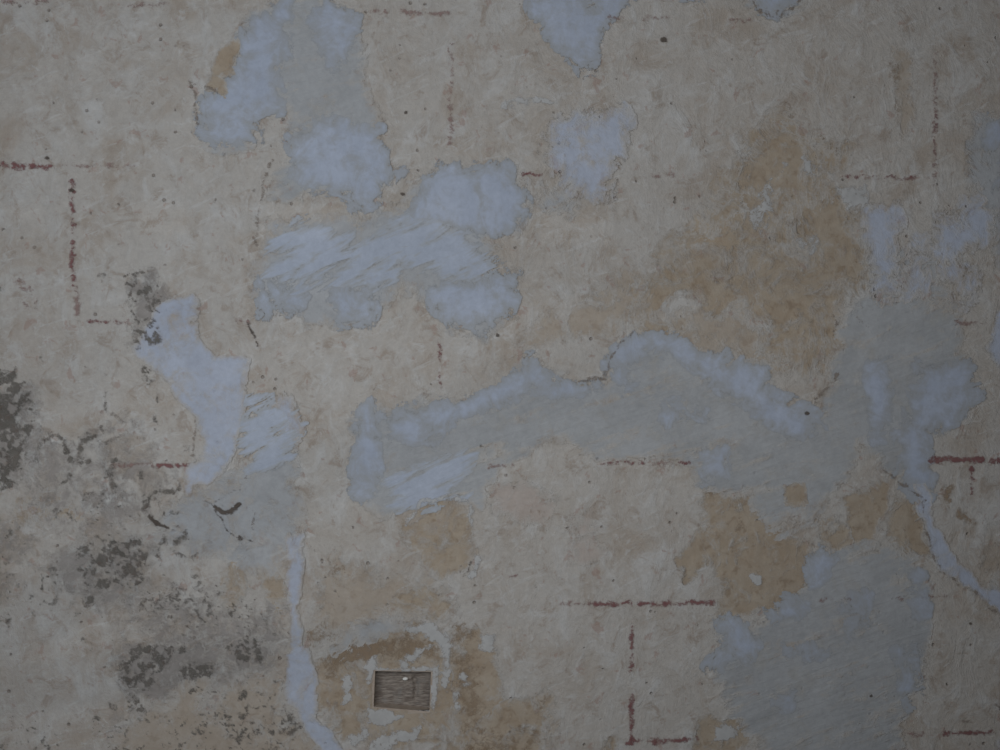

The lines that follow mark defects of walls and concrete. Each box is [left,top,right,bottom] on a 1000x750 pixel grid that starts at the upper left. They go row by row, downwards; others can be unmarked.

leakage [124,266,174,350]
leakage [0,369,565,750]